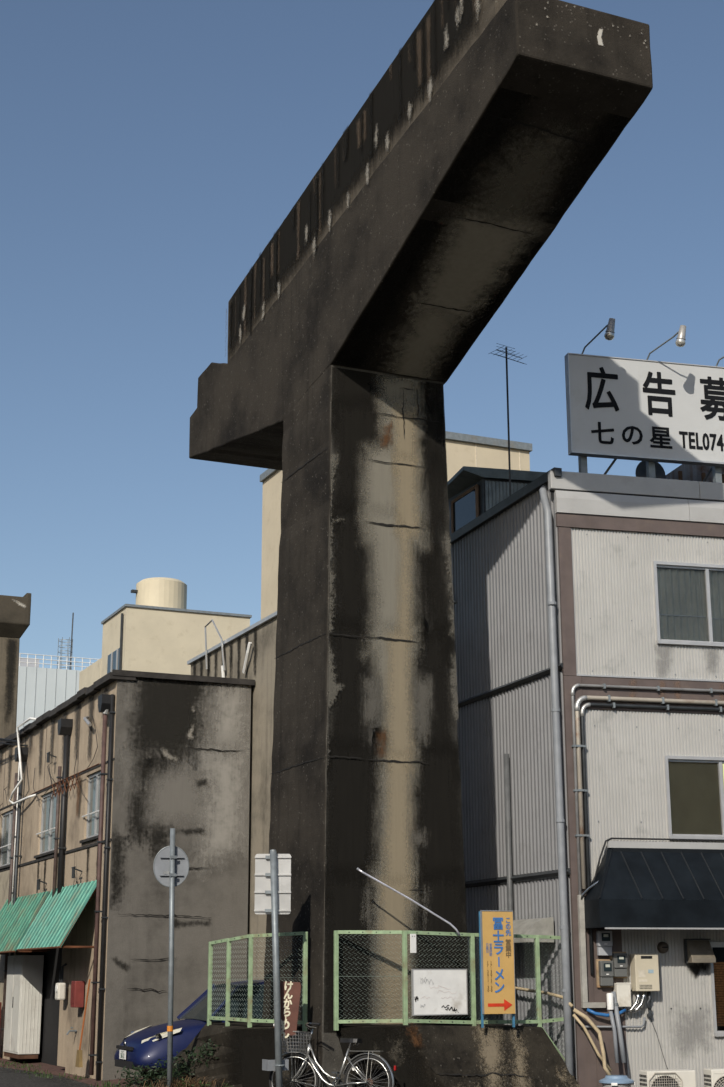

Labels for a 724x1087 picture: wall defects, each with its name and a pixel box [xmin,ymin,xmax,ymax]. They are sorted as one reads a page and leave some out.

leakage [5,639,17,717]
leakage [0,684,109,794]
leakage [110,631,257,906]
leakage [224,88,631,1087]